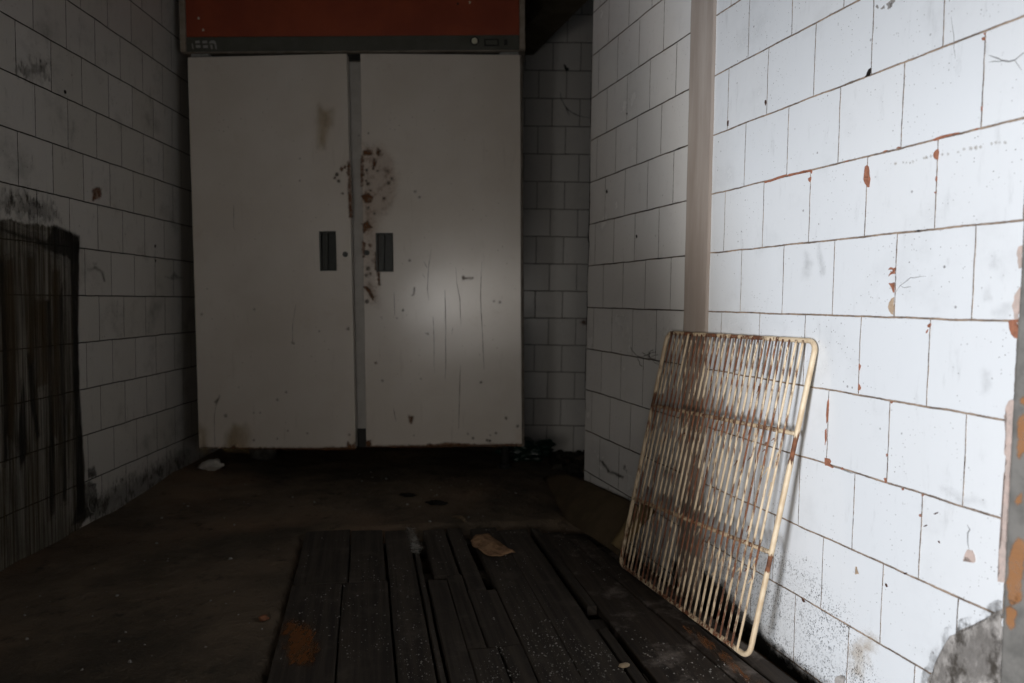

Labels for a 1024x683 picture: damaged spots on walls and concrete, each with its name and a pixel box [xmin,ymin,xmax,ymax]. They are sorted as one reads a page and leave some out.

rust [334,148,384,218]
spalling [863,165,871,187]
rust [362,221,380,302]
spalling [888,267,896,315]
leakage [0,219,97,572]
spalling [927,398,1024,683]